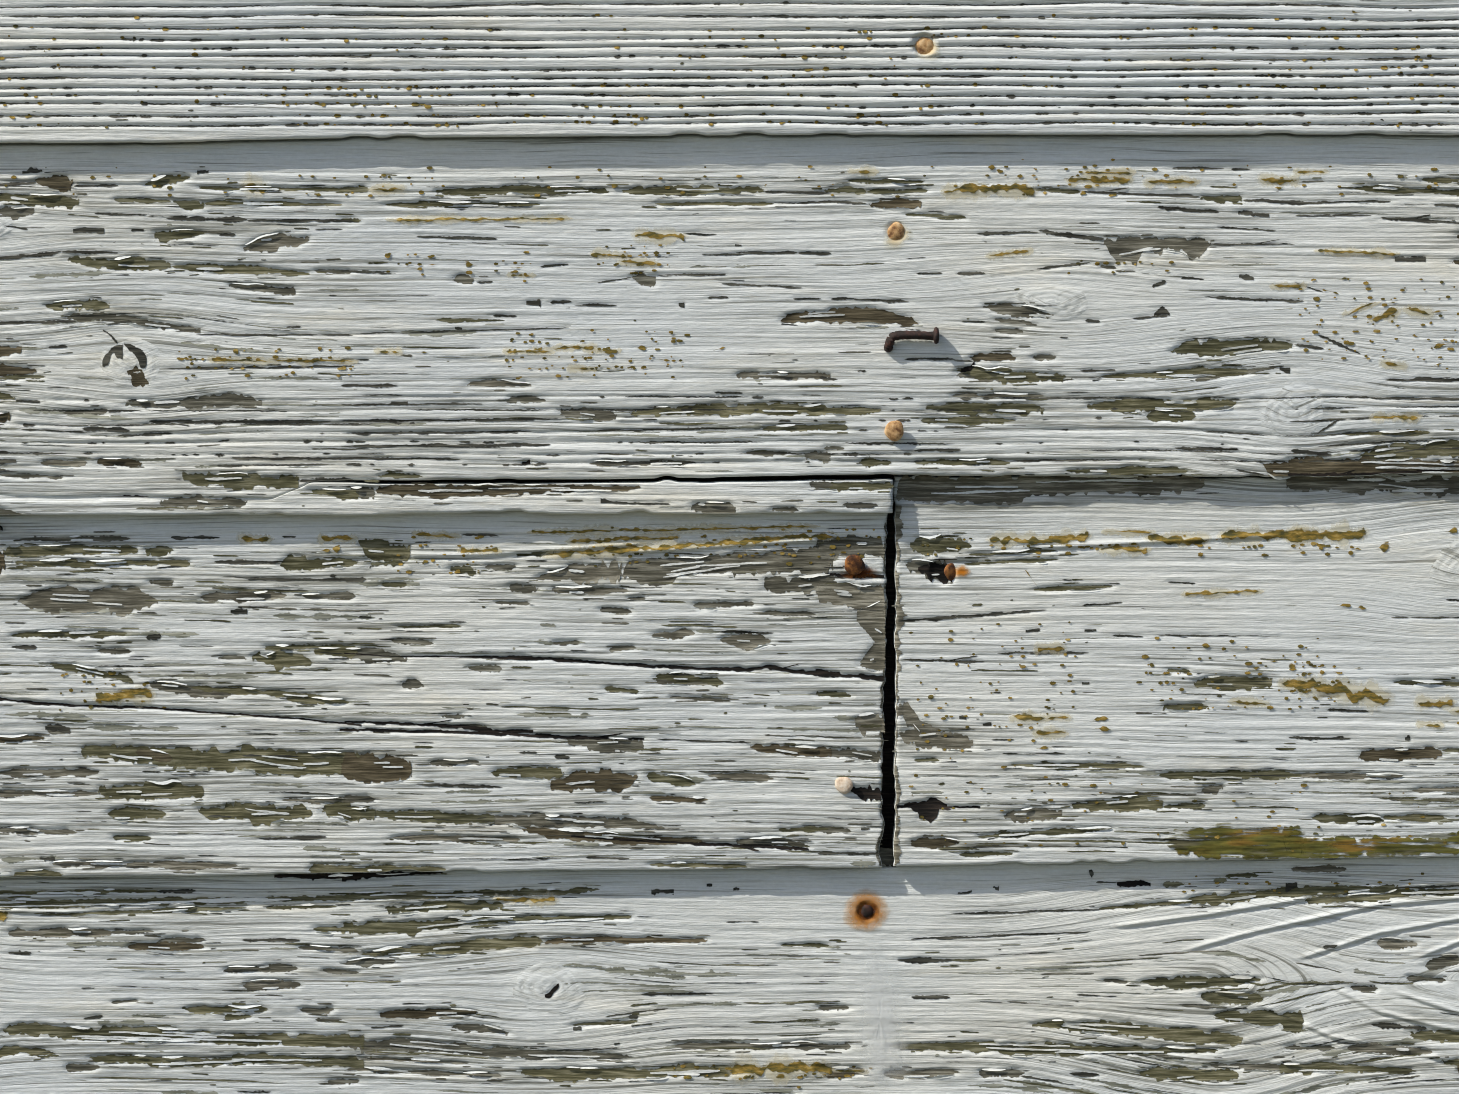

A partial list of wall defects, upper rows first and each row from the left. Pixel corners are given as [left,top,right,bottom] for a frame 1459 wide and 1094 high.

crack [0,1,1459,127]
crack [0,184,351,260]
crack [1081,166,1459,303]
peeling [160,471,640,510]
corrosion [845,568,873,578]
crack [344,651,1088,681]
peeling [535,458,1205,866]
peeling [0,744,746,869]
crack [851,785,980,823]
corrosion [849,895,883,929]
peeling [0,963,829,1083]
peeling [817,975,1459,1082]